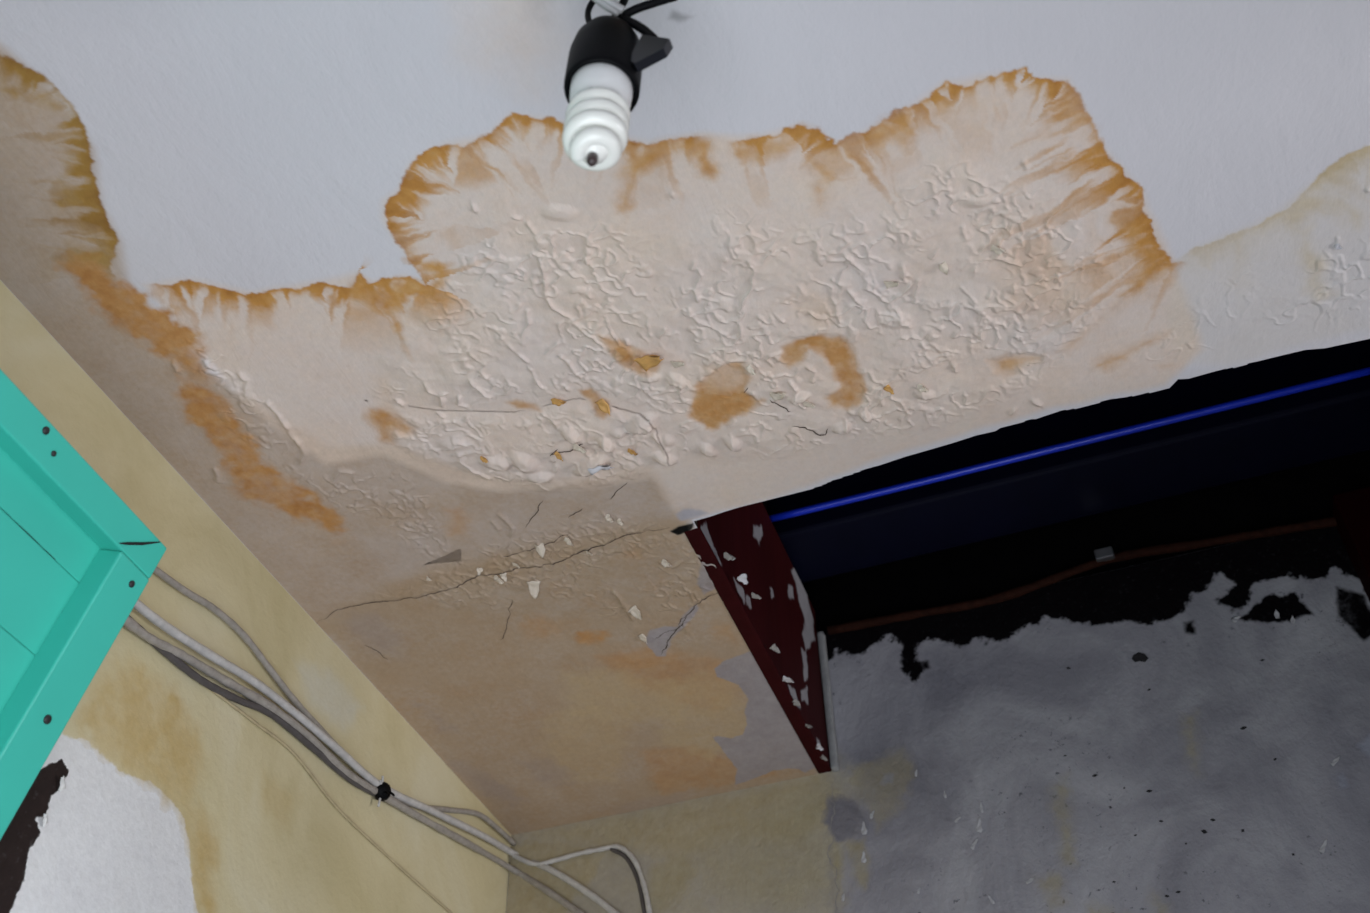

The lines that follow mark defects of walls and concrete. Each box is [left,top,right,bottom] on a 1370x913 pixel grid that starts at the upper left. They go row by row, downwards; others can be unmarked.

water stain [0,36,1370,611]
flaking render [0,759,69,913]
water stain [69,646,247,913]
water stain [255,761,306,842]
water stain [289,651,369,744]
crack [319,483,670,640]
spalling [335,506,828,785]
water stain [306,565,923,913]
crack [659,593,717,653]
water stain [825,527,1370,686]
spalling [1229,589,1316,625]